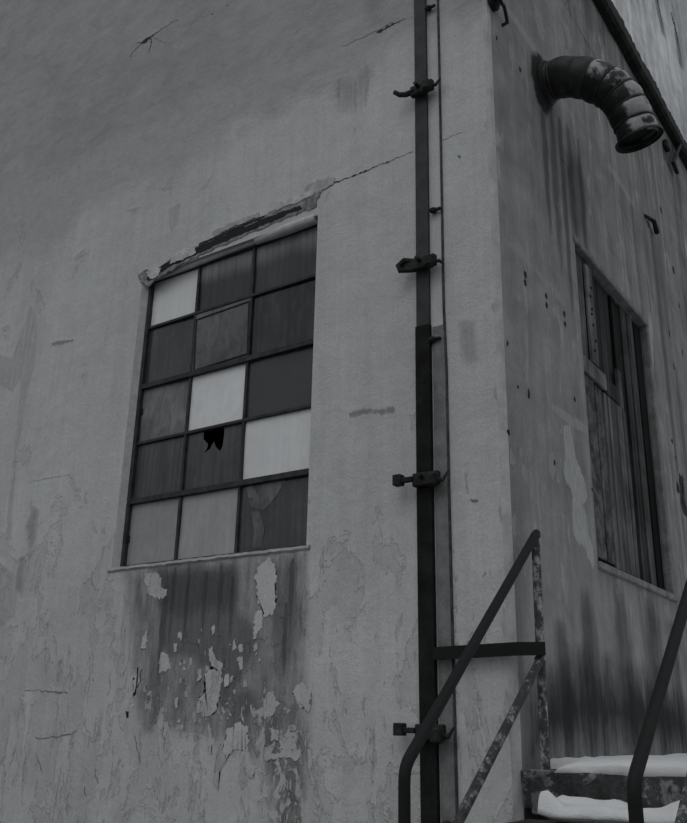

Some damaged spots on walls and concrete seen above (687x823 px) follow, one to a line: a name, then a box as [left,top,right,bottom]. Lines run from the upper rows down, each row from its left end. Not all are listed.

crack [130,1,232,57]
crack [344,18,406,46]
crack [329,151,413,187]
spalling [138,177,335,287]
peeling [144,572,167,600]
peeling [253,557,277,662]
peeling [132,666,142,698]
peeling [158,631,247,723]
water stain [116,537,321,823]
peeling [263,691,280,742]
peeling [208,722,300,790]